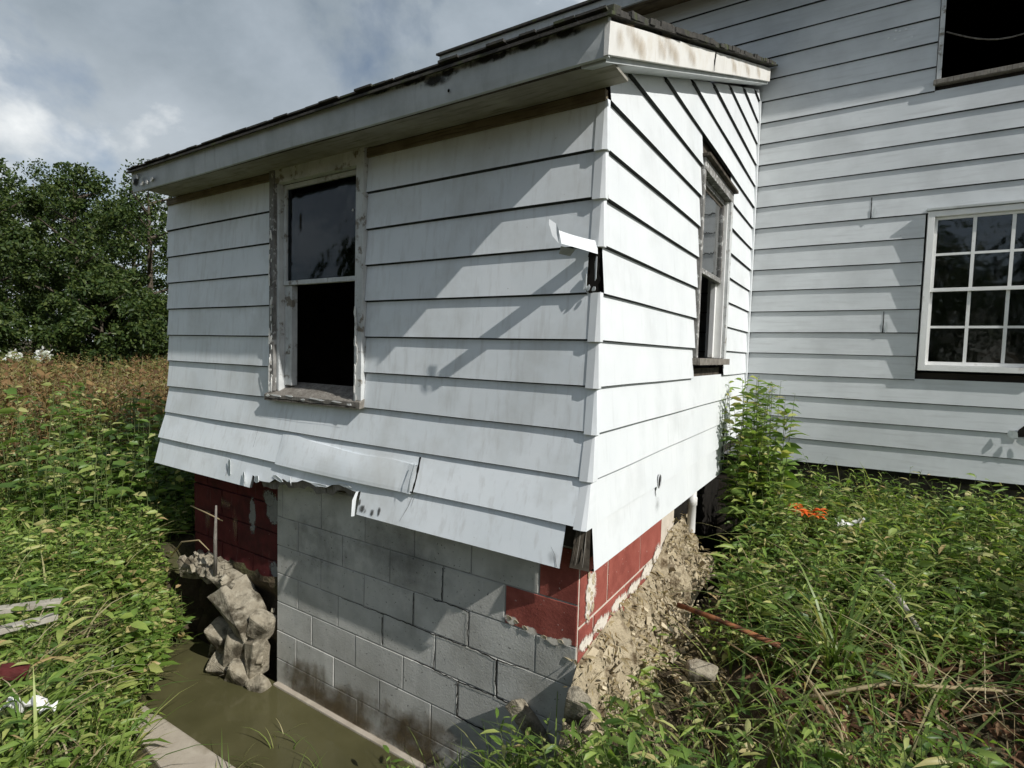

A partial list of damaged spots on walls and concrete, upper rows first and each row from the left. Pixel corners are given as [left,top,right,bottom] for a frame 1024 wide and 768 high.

peeling [266,230,357,406]
peeling [249,490,278,531]
spalling [505,545,662,651]
water stain [293,663,369,727]
water stain [396,717,439,763]